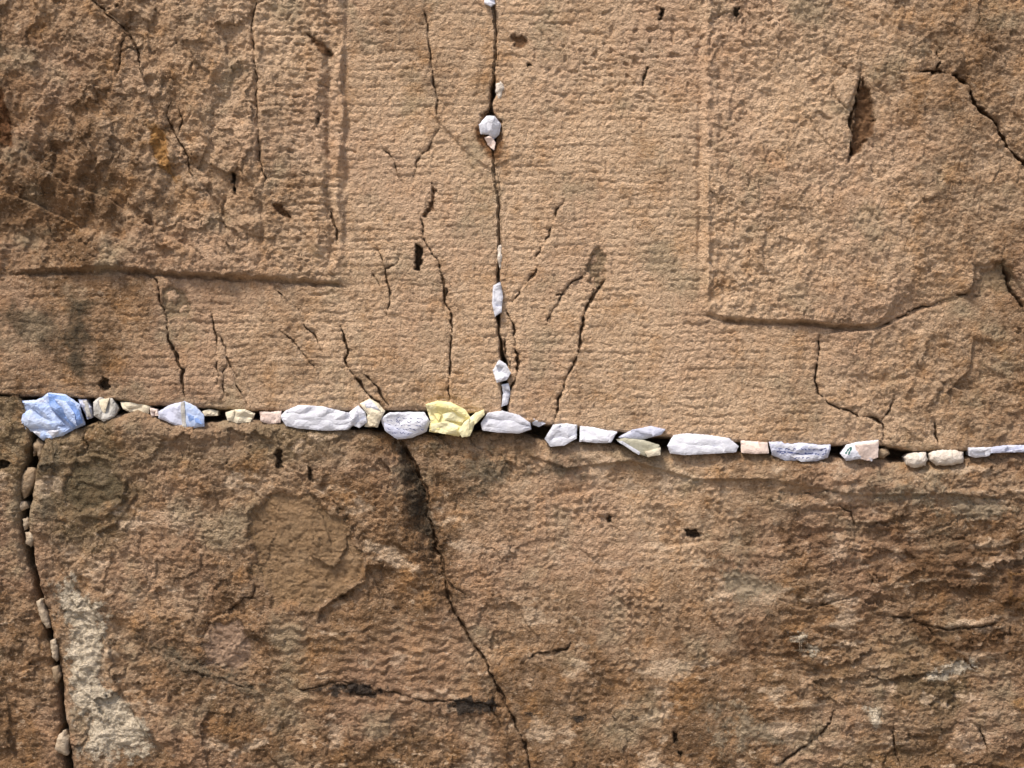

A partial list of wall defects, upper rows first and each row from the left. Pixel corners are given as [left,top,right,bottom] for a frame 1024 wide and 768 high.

crack [168,102,192,175]
crack [424,13,438,114]
spalling [833,73,875,156]
crack [922,62,1024,166]
crack [154,278,184,393]
crack [212,317,240,392]
crack [342,331,385,403]
crack [422,222,453,394]
crack [547,277,604,413]
crack [814,340,893,428]
crack [1002,266,1023,307]
crack [406,446,530,768]